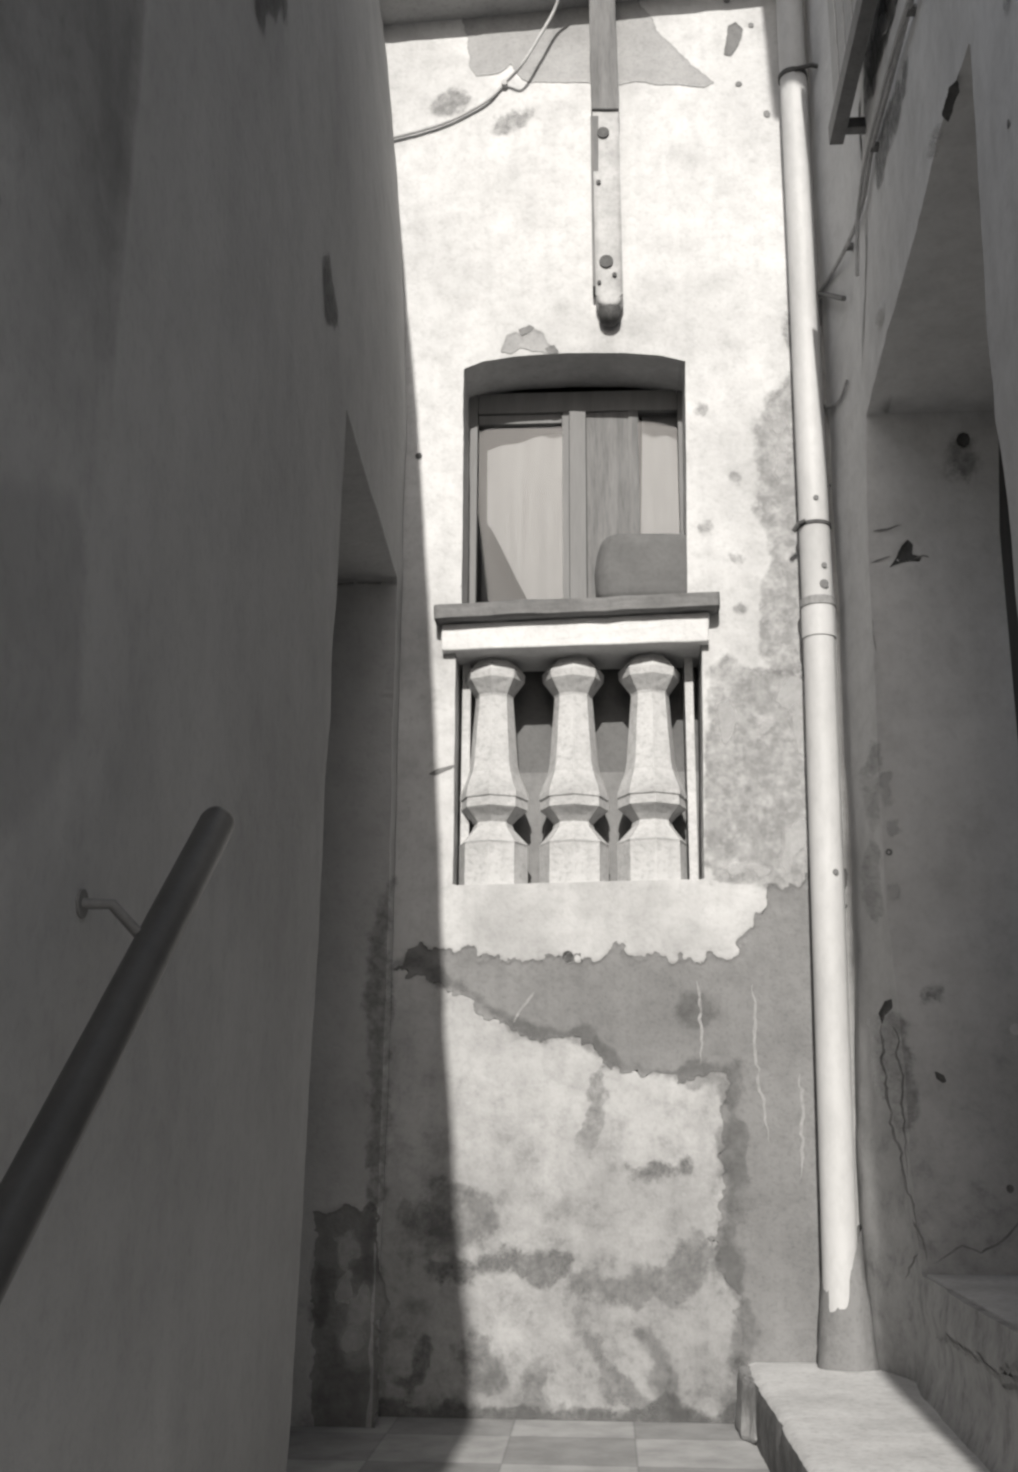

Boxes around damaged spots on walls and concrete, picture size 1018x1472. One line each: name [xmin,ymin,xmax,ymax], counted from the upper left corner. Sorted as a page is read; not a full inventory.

peeling [462,6,591,83]
peeling [615,0,714,88]
spalling [724,22,754,56]
spalling [501,325,559,354]
spalling [871,525,929,567]
peeling [394,869,822,1371]
leakage [640,1158,691,1175]
leakage [429,1250,585,1290]
leakage [378,1336,737,1424]